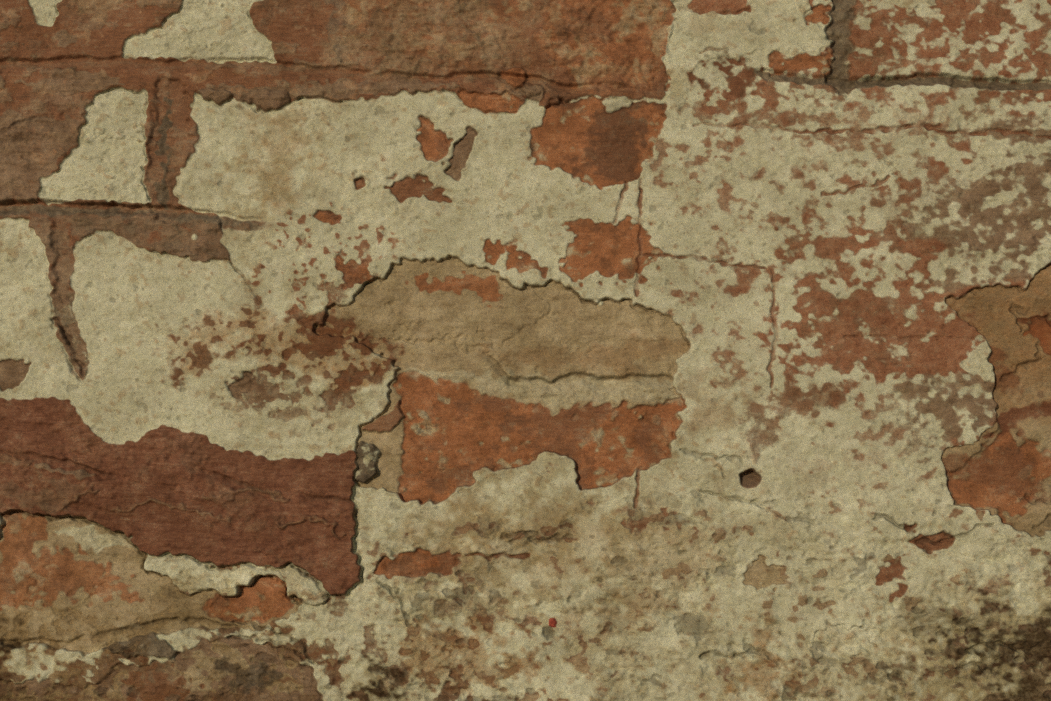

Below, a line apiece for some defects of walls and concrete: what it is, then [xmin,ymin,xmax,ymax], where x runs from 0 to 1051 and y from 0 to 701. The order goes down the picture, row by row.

peeling [29,0,62,27]
peeling [123,0,276,64]
spalling [768,49,833,77]
spalling [805,3,832,25]
spalling [458,90,522,114]
spalling [528,96,668,190]
spalling [313,216,690,503]
spalling [941,263,1051,536]
crack [678,447,817,530]